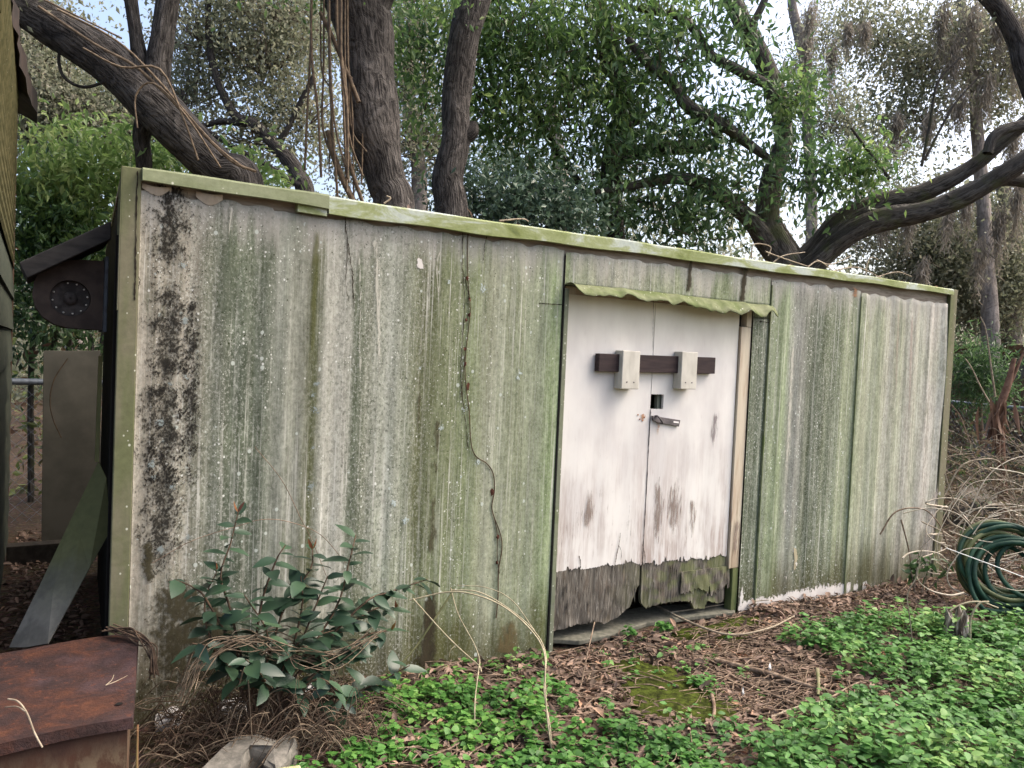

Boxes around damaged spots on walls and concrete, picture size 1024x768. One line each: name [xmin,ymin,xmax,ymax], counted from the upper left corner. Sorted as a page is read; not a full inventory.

damp [131,184,235,699]
crack [460,232,487,447]
damp [585,498,593,525]
damp [655,477,697,542]